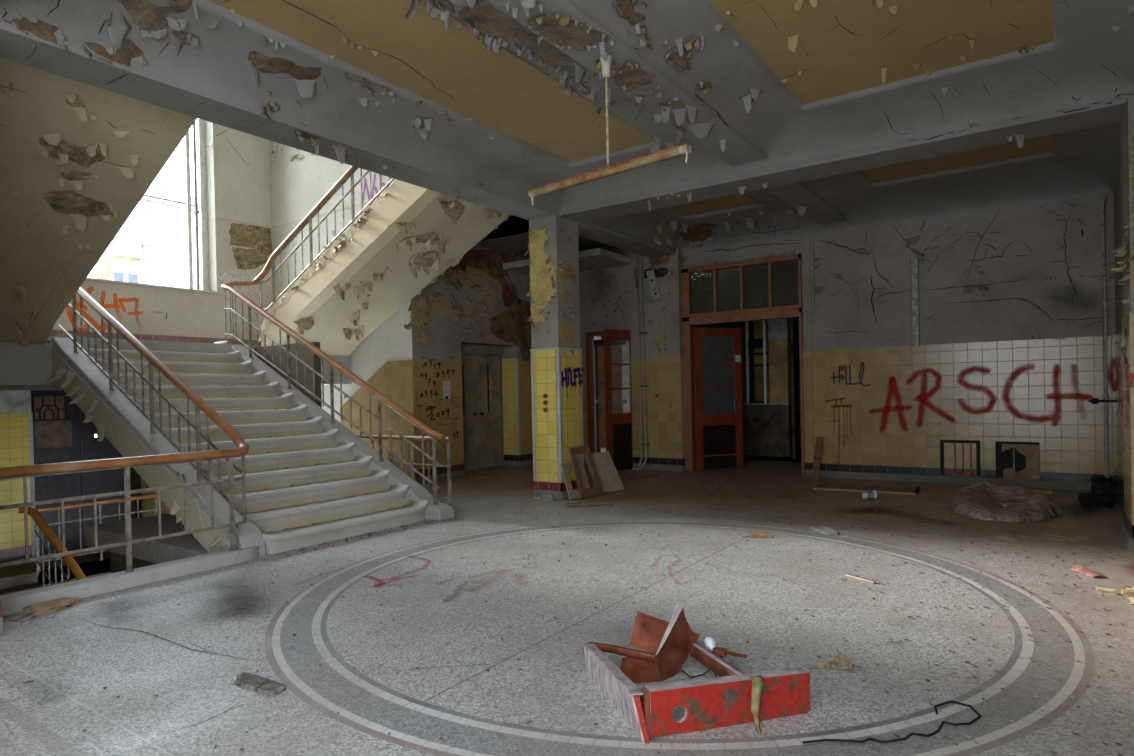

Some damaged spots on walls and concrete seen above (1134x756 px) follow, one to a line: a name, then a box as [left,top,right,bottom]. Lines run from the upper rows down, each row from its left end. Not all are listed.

peeling [1,0,68,50]
peeling [82,0,218,67]
crack [282,0,461,105]
peeling [405,0,737,153]
peeling [11,94,155,251]
spalling [258,184,393,342]
peeling [426,199,465,224]
peeling [387,222,579,361]
crack [697,199,1110,333]
peeling [1093,119,1134,316]